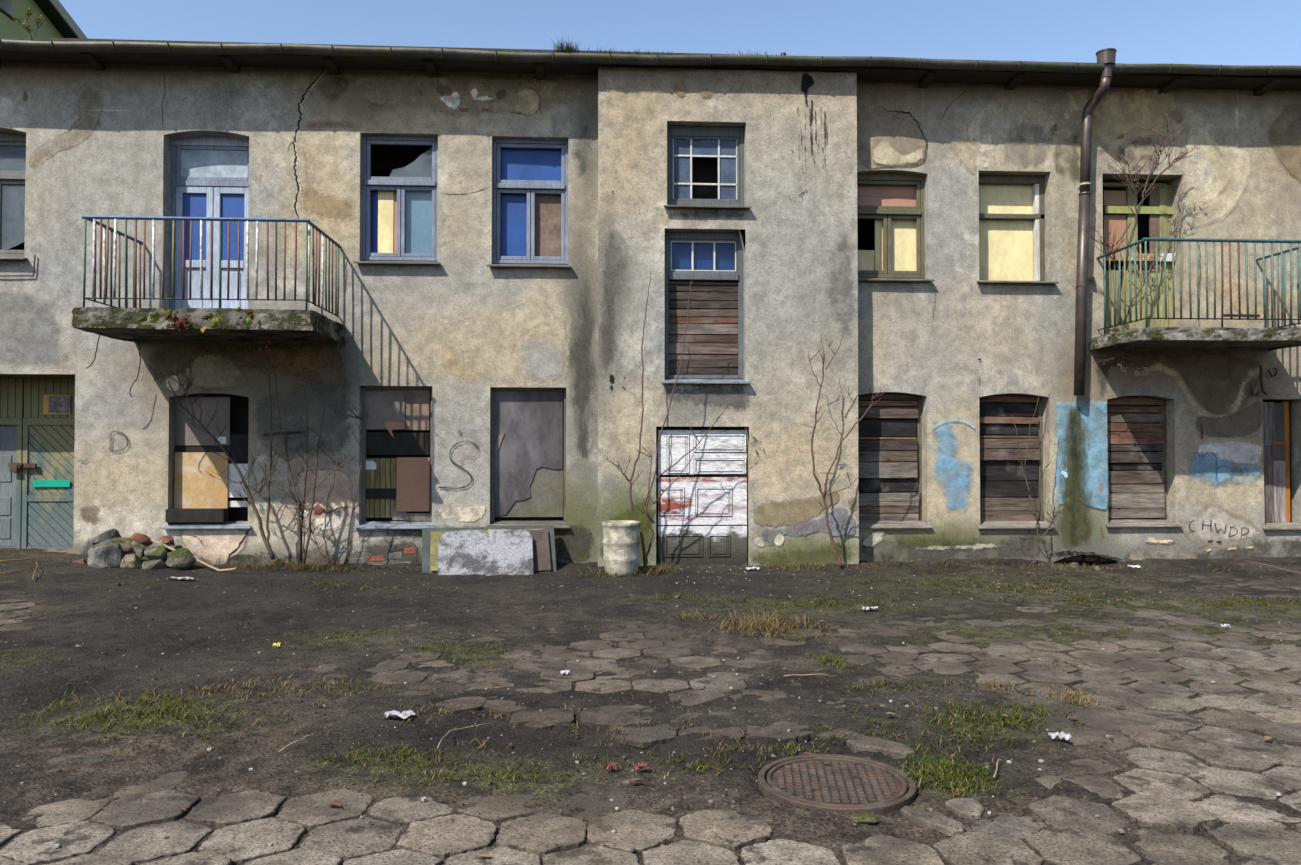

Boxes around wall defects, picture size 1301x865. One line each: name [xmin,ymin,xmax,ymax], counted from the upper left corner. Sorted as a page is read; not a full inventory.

peeling [362,75,581,117]
crack [288,69,327,226]
damp [798,97,828,170]